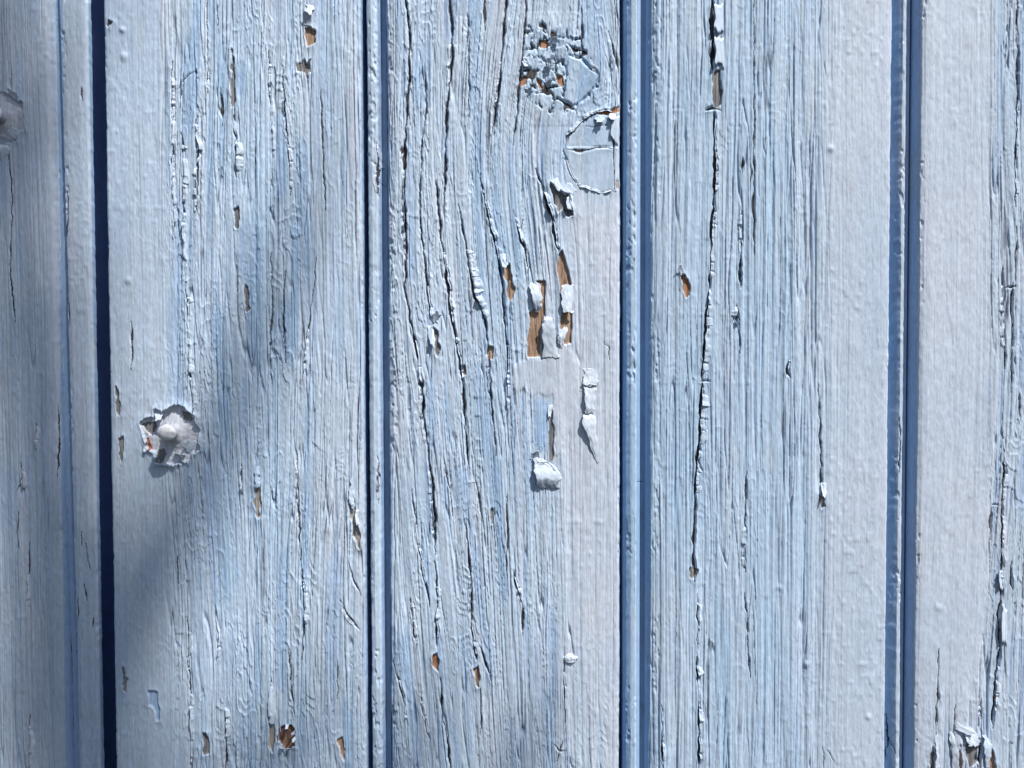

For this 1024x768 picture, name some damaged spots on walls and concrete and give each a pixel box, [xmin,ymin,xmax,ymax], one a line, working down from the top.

peeling [520,23,620,146]
peeling [549,153,619,217]
peeling [497,254,515,302]
peeling [527,250,574,359]
peeling [678,264,690,297]
peeling [140,406,200,465]
crack [373,0,529,768]
peeling [531,396,562,489]
peeling [582,368,599,463]
crack [691,0,755,768]
crack [935,0,1021,768]
peeling [929,722,996,768]